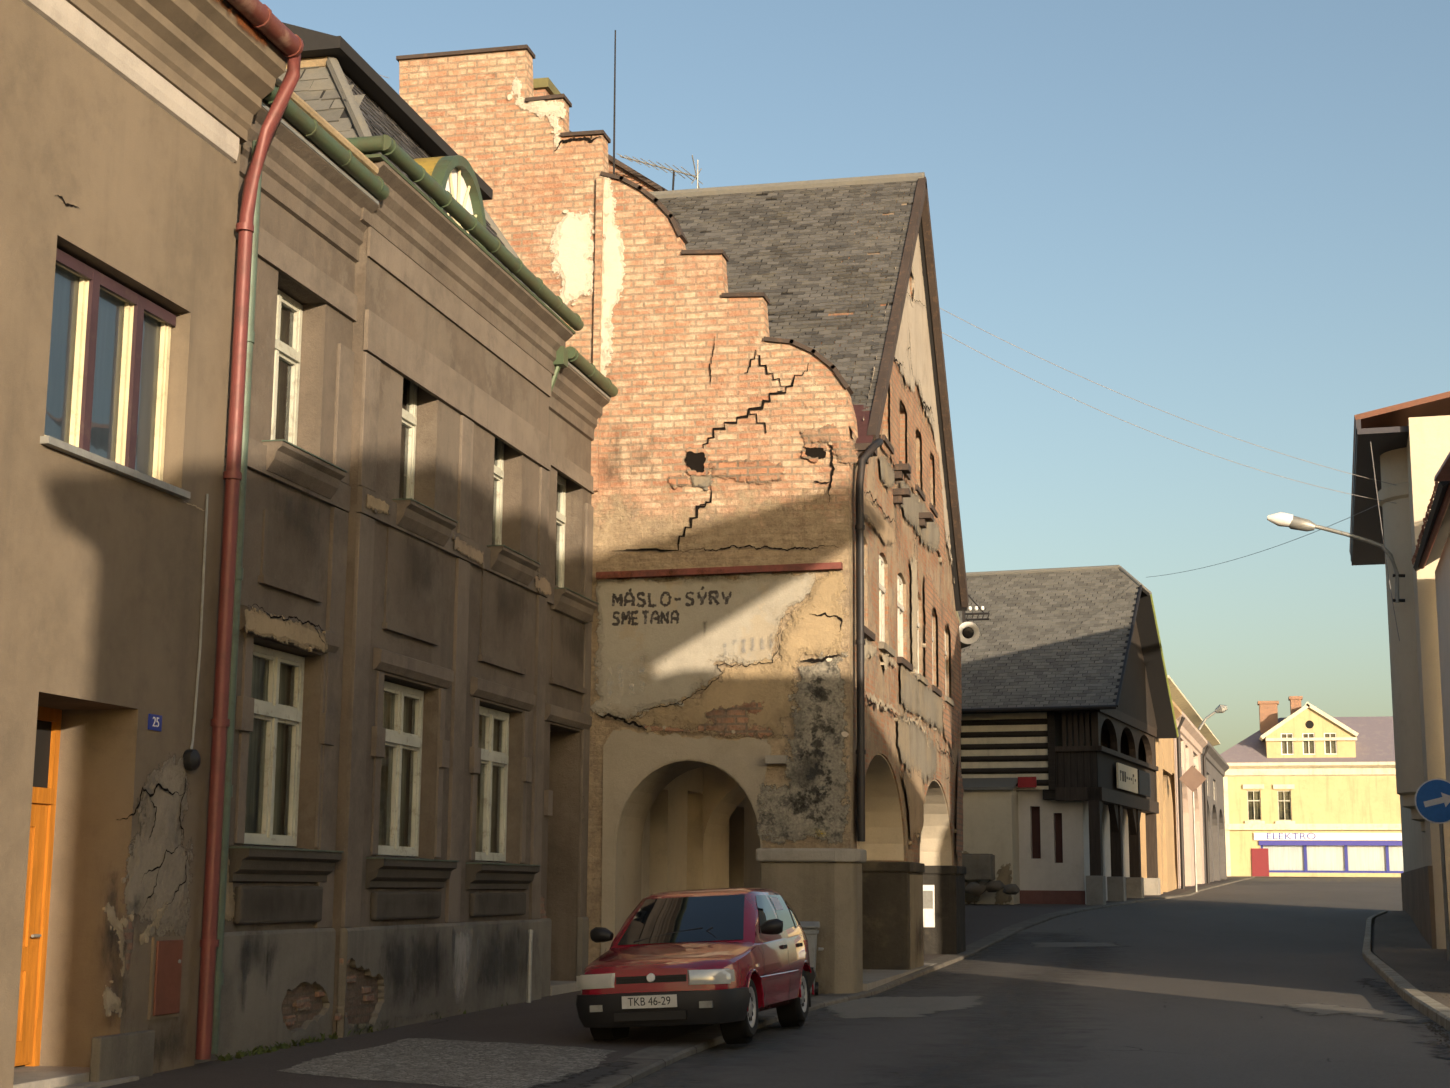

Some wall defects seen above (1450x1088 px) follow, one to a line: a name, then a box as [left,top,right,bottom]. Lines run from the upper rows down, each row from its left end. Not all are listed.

flaking render [507,77,566,149]
flaking render [549,176,626,377]
crack [702,336,809,449]
crack [617,489,836,552]
flaking render [590,223,962,847]
flaking render [244,606,328,653]
crack [597,594,843,731]
water stain [780,676,835,824]
crack [865,692,957,783]
flaking render [102,753,195,1017]
crack [117,773,188,911]
water stain [386,931,519,995]